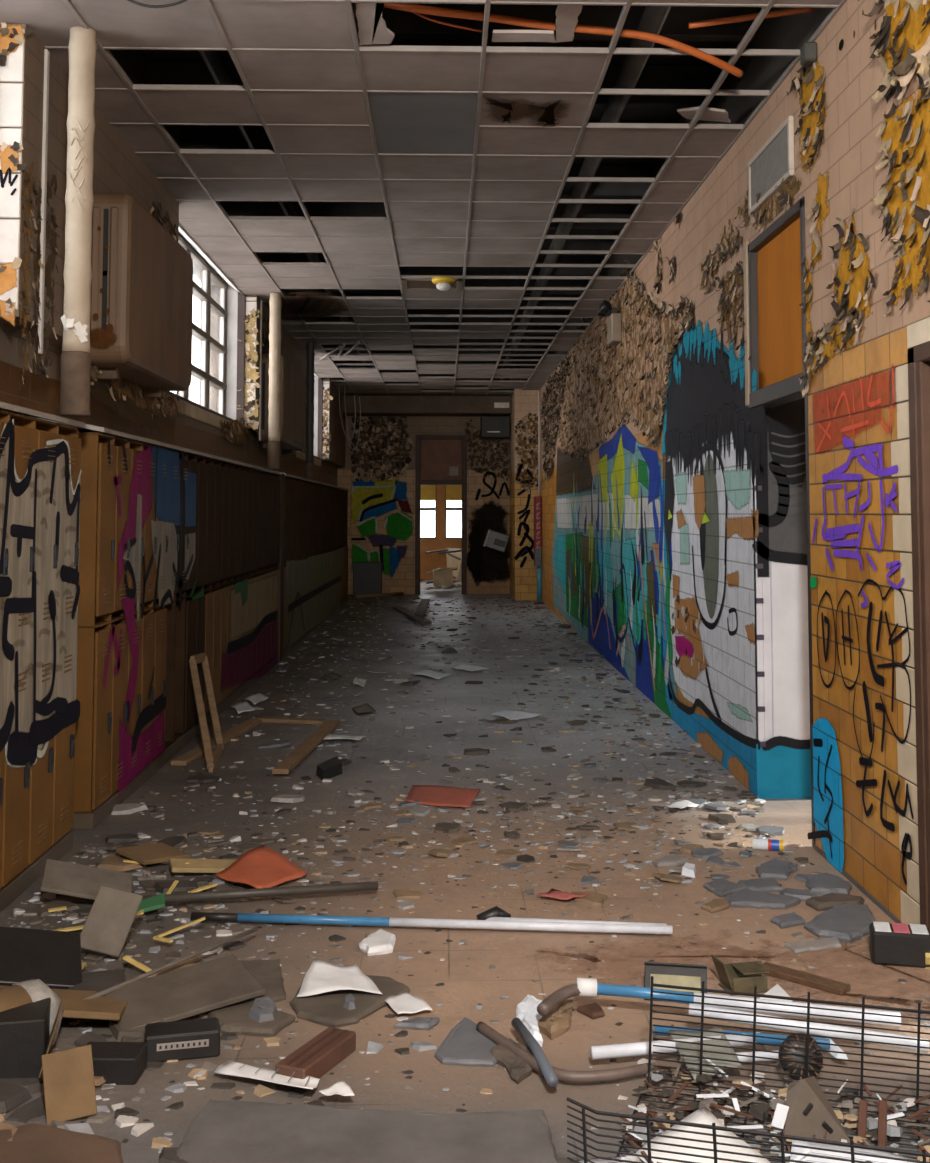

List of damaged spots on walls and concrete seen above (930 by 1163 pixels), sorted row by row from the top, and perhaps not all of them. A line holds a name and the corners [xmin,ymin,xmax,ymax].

peeling [0,22,33,66]
spalling [356,3,394,45]
peeling [149,202,179,242]
peeling [0,141,59,395]
peeling [465,0,930,495]